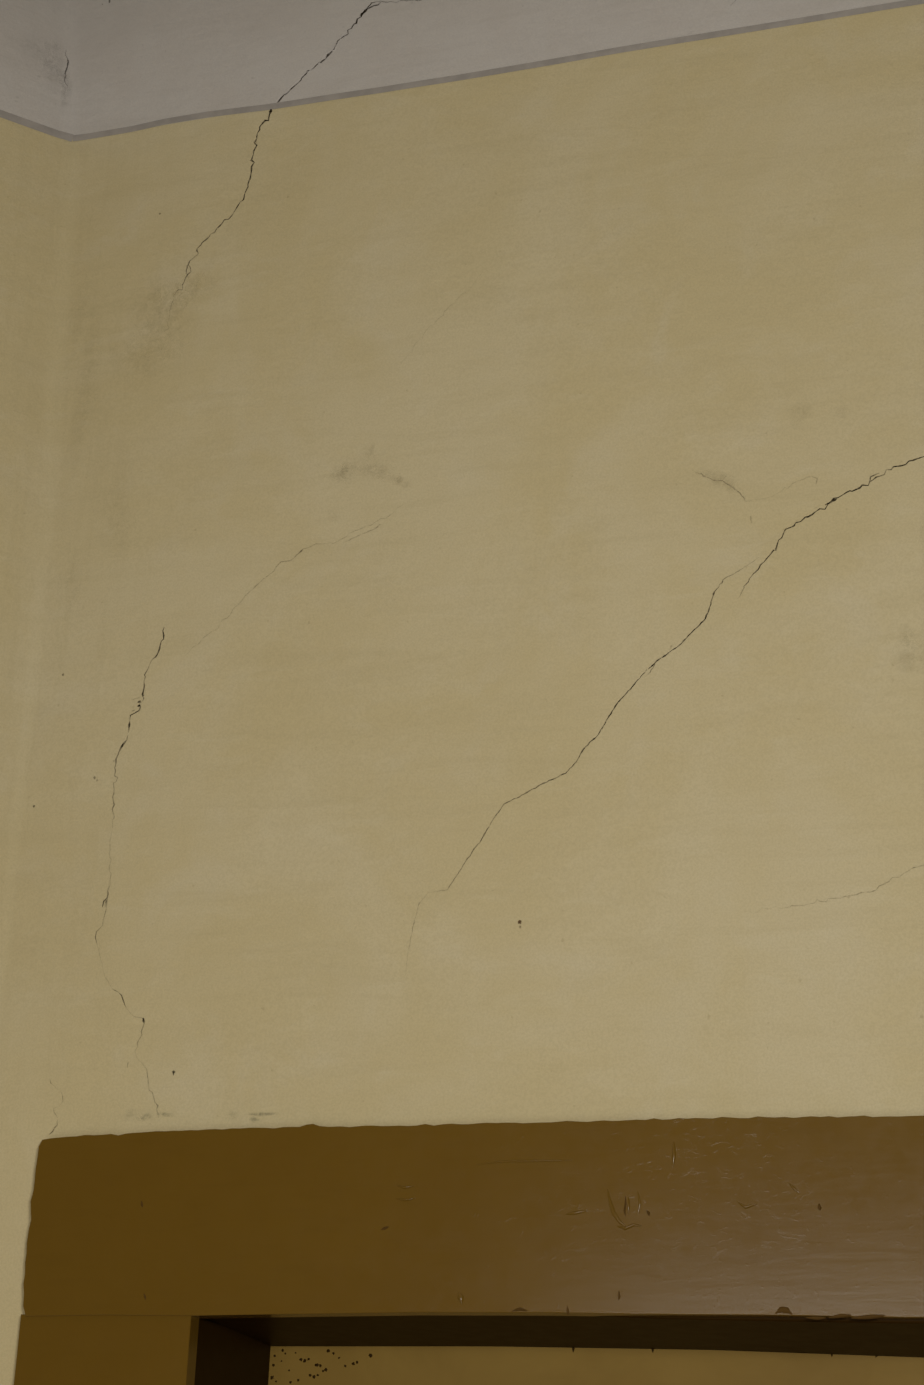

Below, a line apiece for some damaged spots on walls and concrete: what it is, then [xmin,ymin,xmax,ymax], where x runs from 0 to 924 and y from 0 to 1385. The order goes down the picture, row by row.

crack [183,0,420,283]
crack [112,628,165,809]
crack [471,456,924,854]